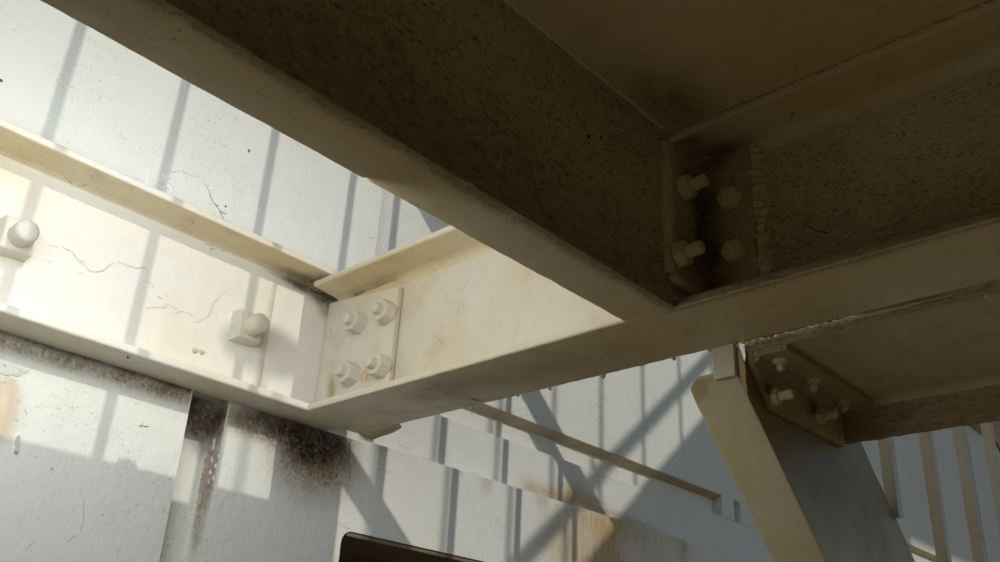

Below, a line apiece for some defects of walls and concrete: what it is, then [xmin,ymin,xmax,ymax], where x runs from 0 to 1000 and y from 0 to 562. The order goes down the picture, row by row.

crack [44,245,231,321]
leakage [251,412,347,467]
rust [582,514,625,562]